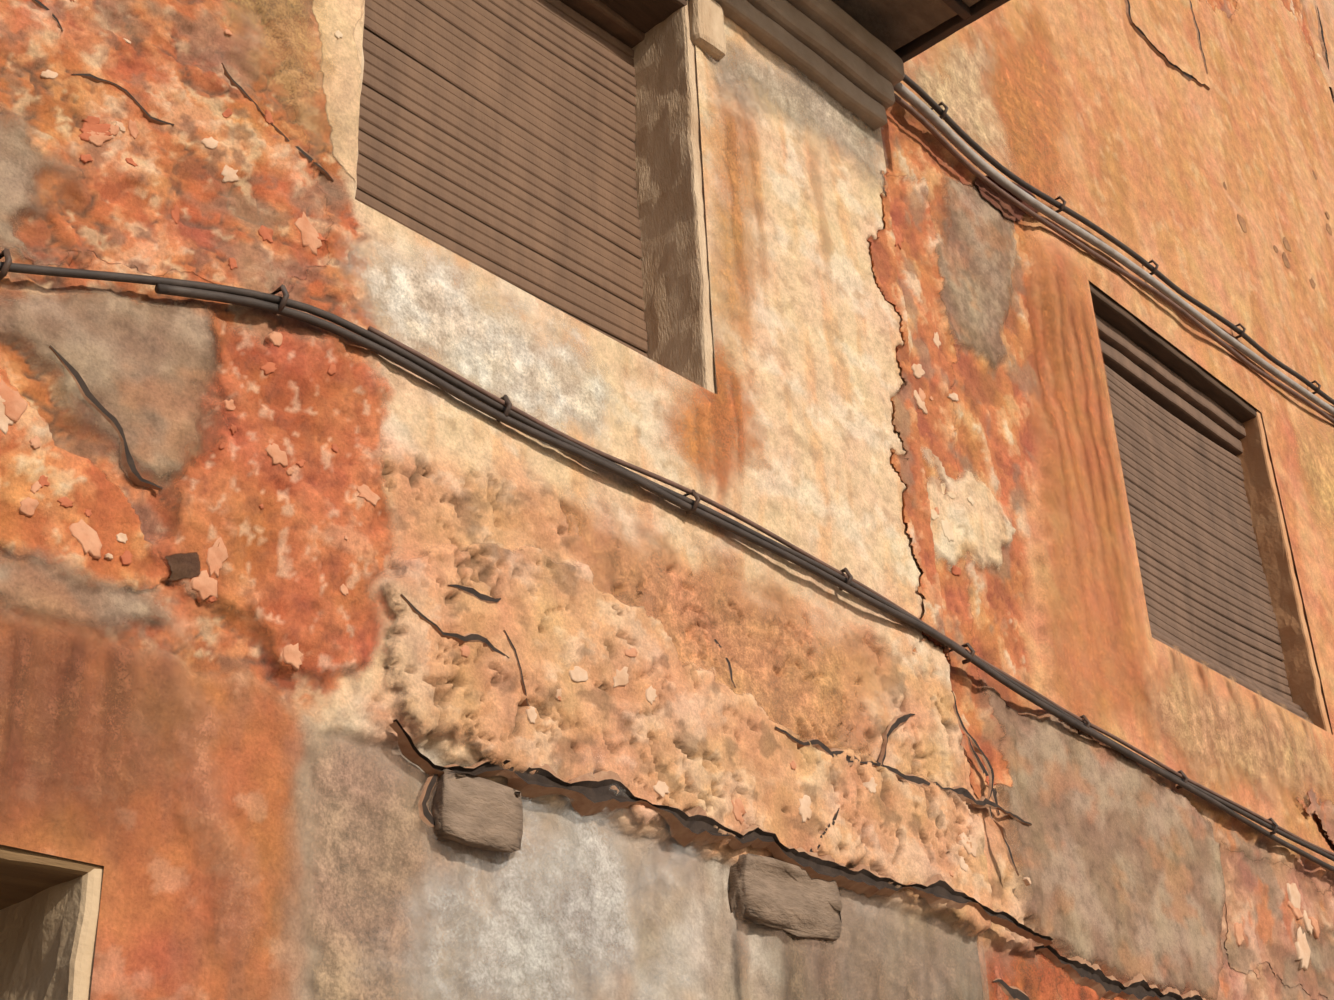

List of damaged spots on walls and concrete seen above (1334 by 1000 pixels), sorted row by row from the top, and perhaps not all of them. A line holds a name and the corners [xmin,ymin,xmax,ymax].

crack [1124,0,1210,91]
crack [1315,6,1334,99]
spalling [0,0,364,296]
flaking render [0,368,172,591]
spalling [384,170,1016,937]
crack [389,719,1206,1000]
crack [774,691,1032,876]
spalling [1220,841,1334,1000]
flaking render [1296,788,1334,845]